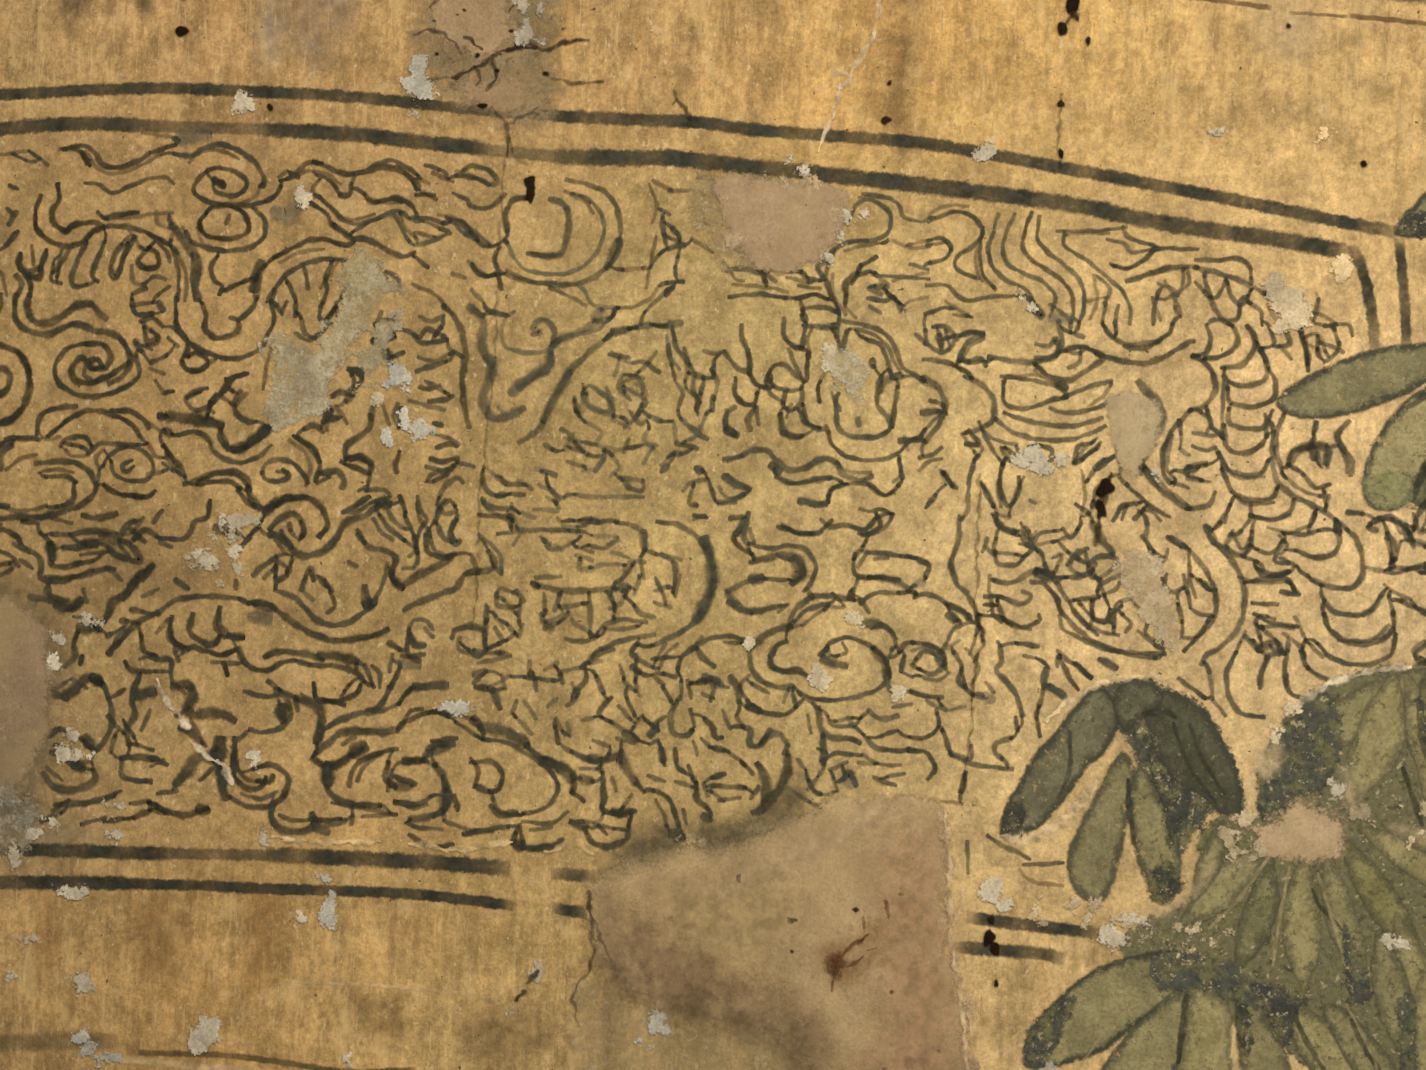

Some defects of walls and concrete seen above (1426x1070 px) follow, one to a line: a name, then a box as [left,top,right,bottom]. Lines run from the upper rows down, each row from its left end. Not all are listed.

flaking render [400,0,565,124]
peeling [764,154,822,190]
peeling [820,202,870,267]
peeling [337,247,403,301]
peeling [355,307,438,448]
peeling [8,815,58,871]
peeling [98,798,126,846]
flaking render [1217,763,1376,868]
peeling [1401,801,1426,850]
flaking render [584,791,981,1070]